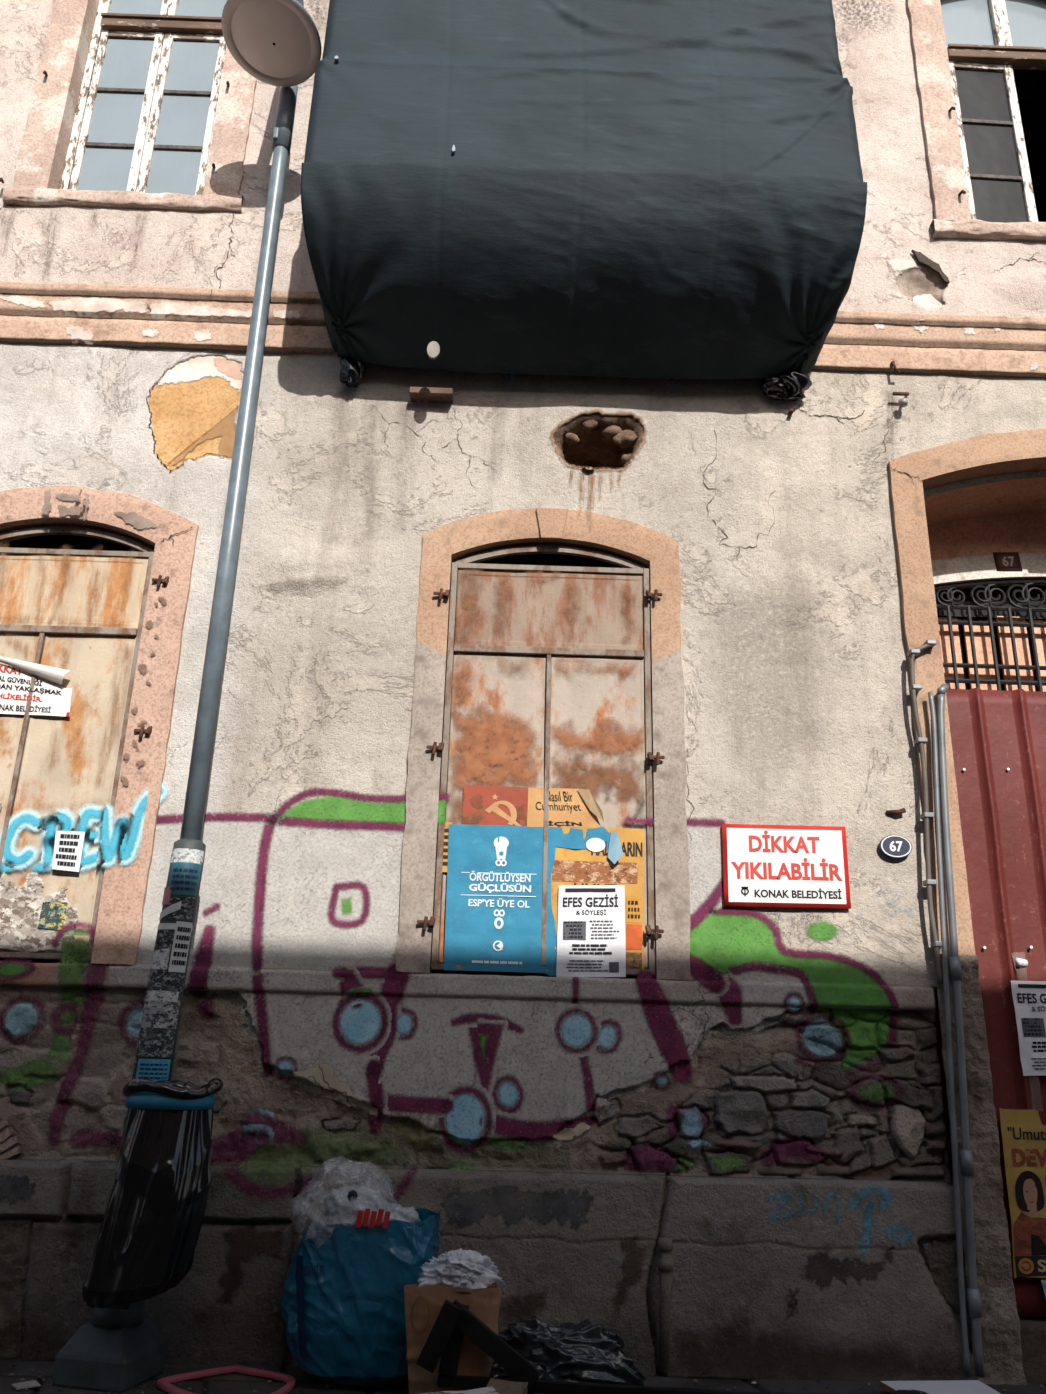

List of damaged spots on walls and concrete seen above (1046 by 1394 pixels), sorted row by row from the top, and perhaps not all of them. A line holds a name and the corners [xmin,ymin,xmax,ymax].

crack [210,212,234,302]
peeling [272,310,301,320]
flaking render [0,296,252,473]
spalling [550,408,647,473]
crack [700,430,775,561]
corrosion [450,661,537,825]
corrosion [552,716,644,810]
flaking render [0,985,147,1162]
flaking render [171,967,953,1183]